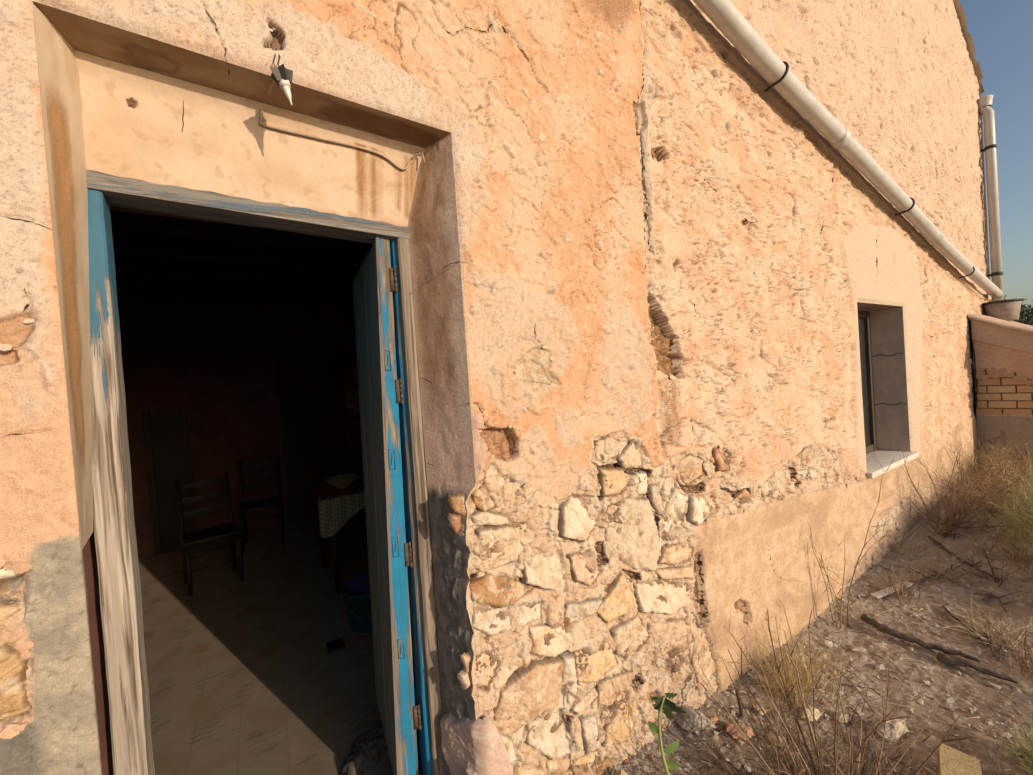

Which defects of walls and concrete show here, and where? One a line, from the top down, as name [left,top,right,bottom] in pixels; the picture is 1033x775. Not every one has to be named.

crack [204,4,230,75]
crack [432,1,532,67]
peeling [0,314,35,366]
spalling [440,425,859,775]
spalling [0,558,35,739]